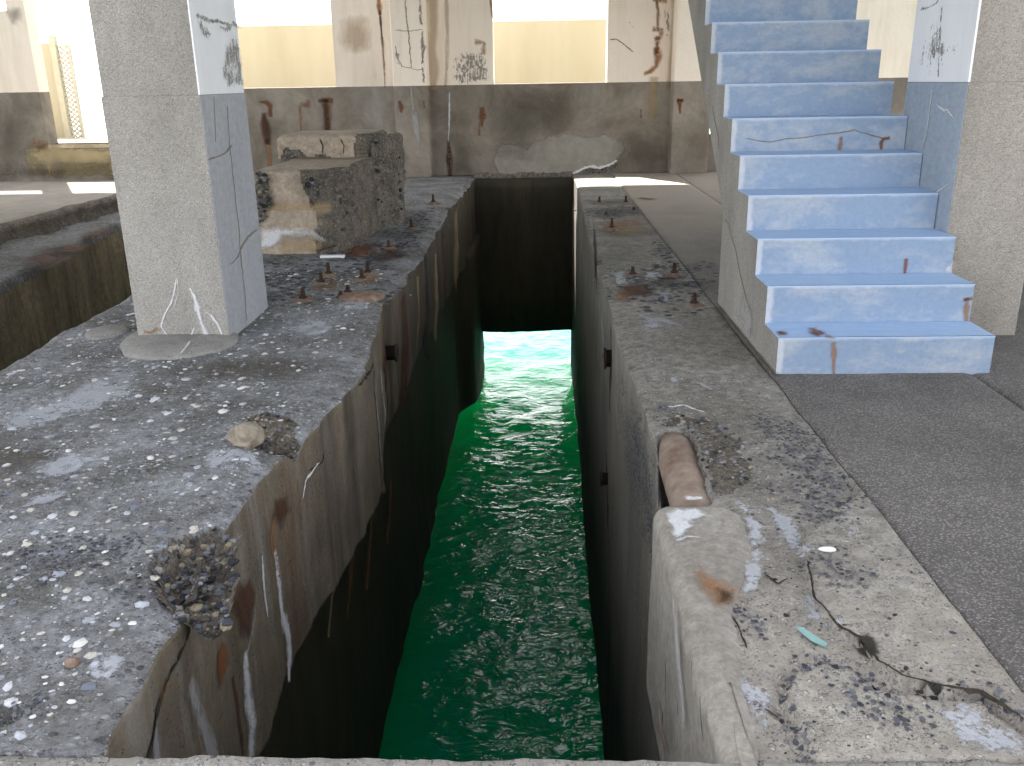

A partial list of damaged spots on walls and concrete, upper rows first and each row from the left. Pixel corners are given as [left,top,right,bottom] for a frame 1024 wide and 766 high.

crack [395,0,422,70]
rust [644,0,667,75]
rust [299,98,333,131]
spalling [253,169,275,226]
water stain [144,278,222,354]
rust [811,328,836,374]
spalling [244,411,300,458]
spalling [0,525,242,758]
efflorescence [262,523,292,681]
crack [731,604,767,648]
crack [745,560,1024,763]
efflorescence [243,643,256,757]